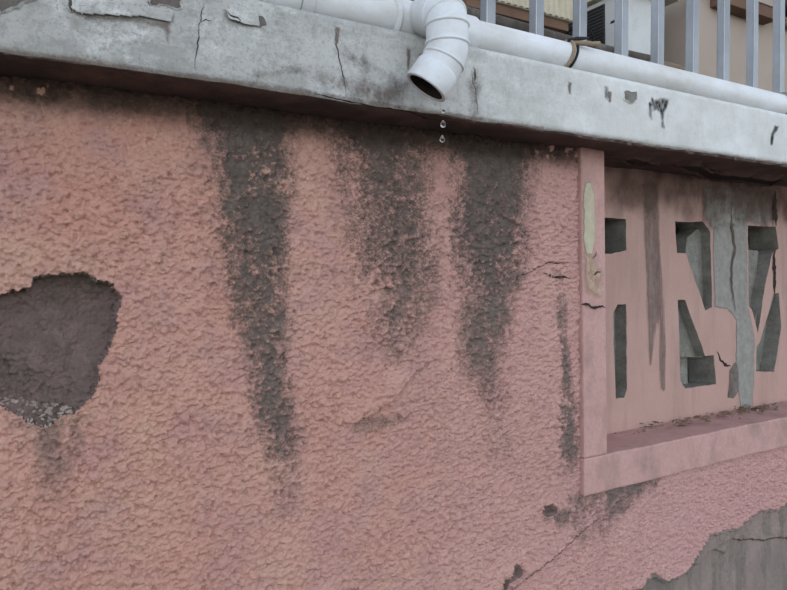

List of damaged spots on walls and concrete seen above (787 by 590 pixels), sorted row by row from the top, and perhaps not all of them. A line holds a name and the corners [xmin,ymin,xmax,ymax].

peeling [0,0,37,14]
peeling [64,0,183,22]
crack [194,7,241,67]
crack [309,32,456,123]
water stain [0,75,580,463]
spalling [0,271,122,431]
peeling [713,218,755,408]
flaking render [634,503,787,590]
crack [730,534,787,542]